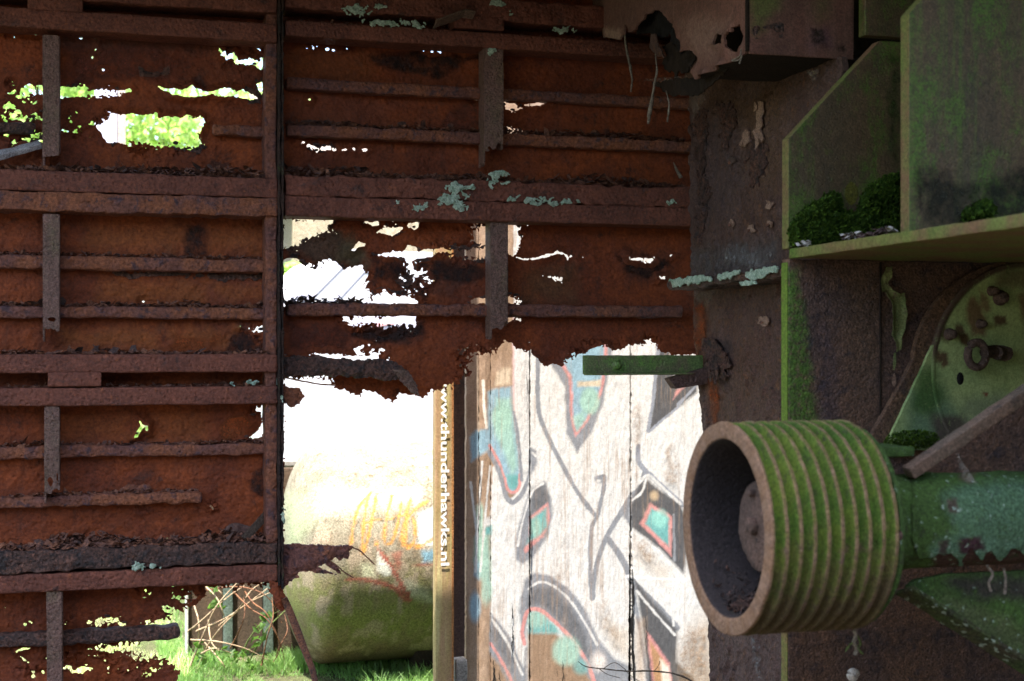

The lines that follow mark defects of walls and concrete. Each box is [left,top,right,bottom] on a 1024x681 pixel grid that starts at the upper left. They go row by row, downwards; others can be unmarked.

peeling [739,101,765,149]
peeling [283,238,318,269]
peeling [396,257,429,283]